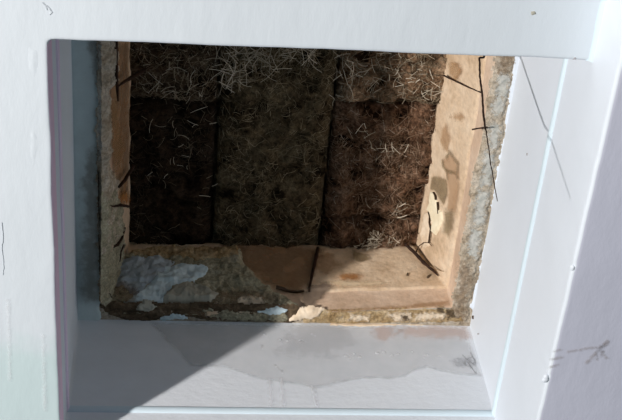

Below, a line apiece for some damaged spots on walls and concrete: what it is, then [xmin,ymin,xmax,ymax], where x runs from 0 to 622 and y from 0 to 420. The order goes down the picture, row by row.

spalling [95,41,515,327]